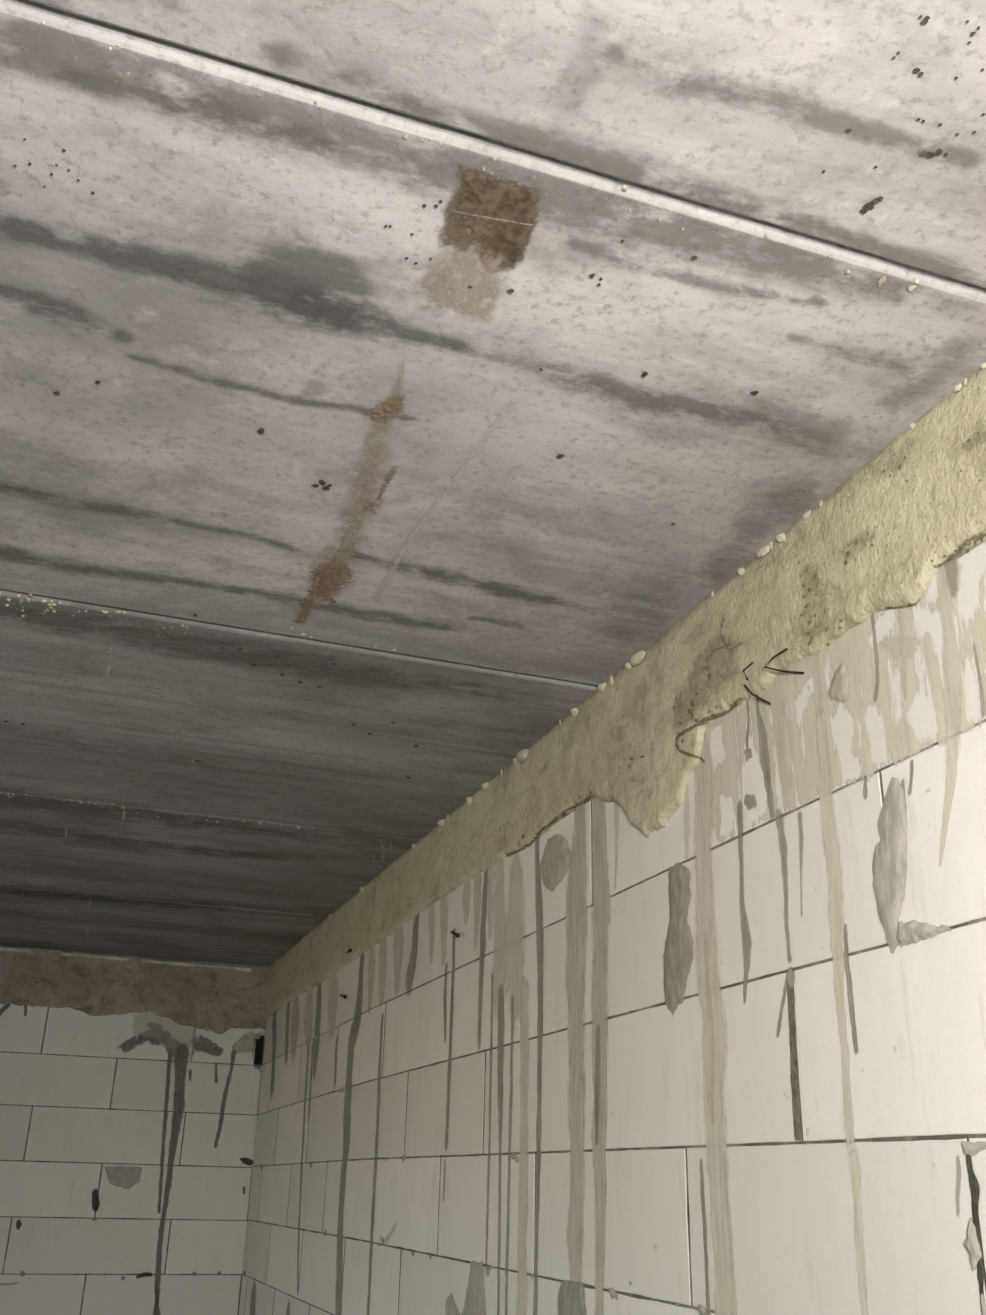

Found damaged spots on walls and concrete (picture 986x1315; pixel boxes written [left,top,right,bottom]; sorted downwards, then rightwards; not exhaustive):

damp [0,548,450,630]
damp [0,217,467,352]
rust [297,376,404,624]
damp [346,551,560,604]
rust [425,166,539,317]
damp [0,21,967,296]
damp [563,375,780,430]
damp [695,531,986,1315]
damp [120,1023,236,1315]
damp [270,836,543,1315]
damp [566,798,619,1315]
crack [963,1154,986,1315]